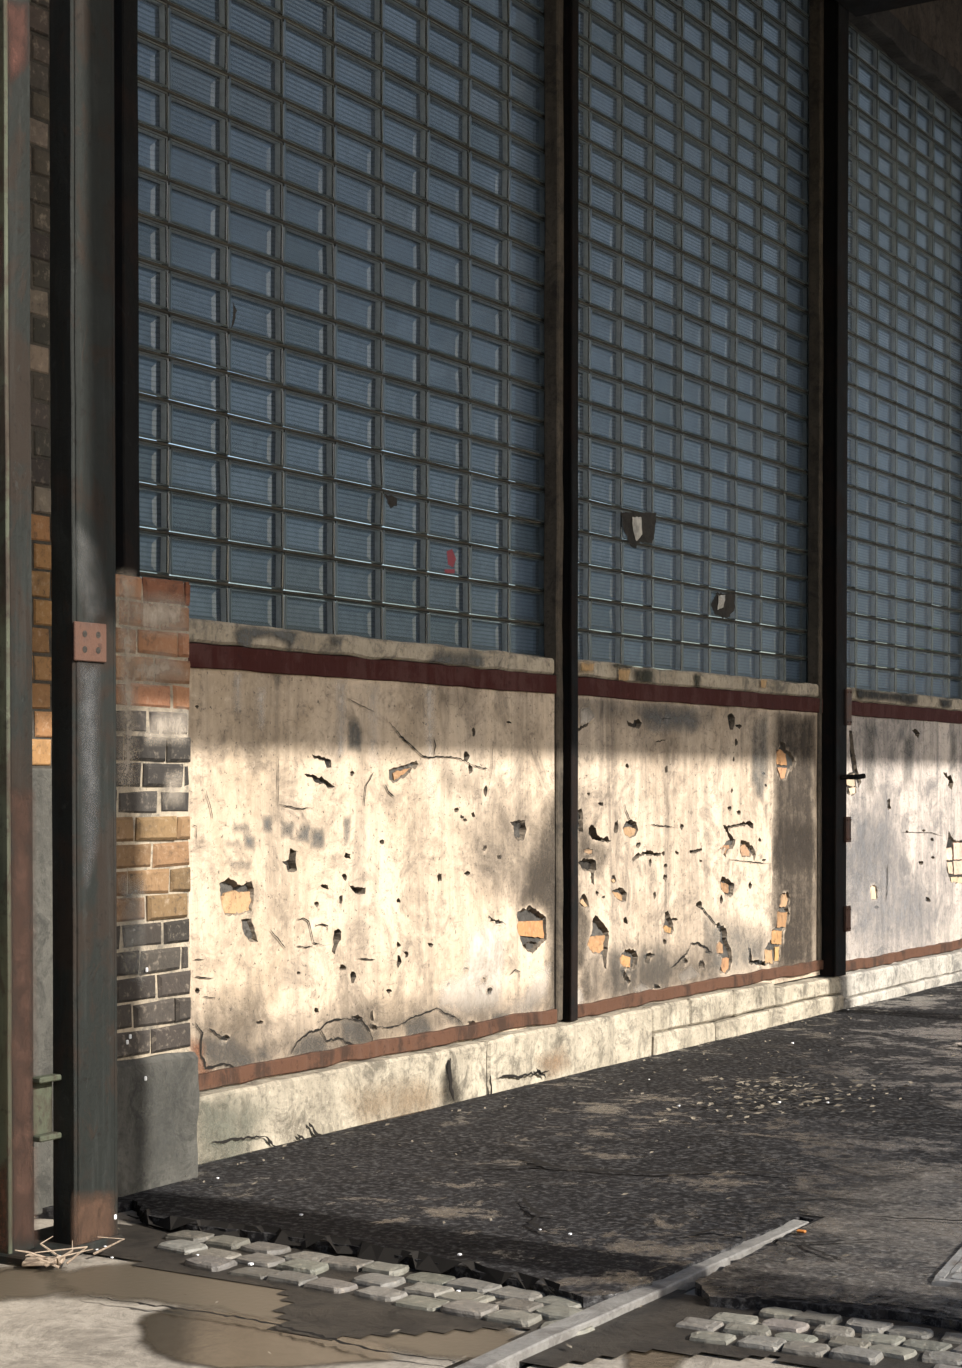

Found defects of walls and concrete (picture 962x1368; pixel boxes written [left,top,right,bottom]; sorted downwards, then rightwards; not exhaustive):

crack [348,698,493,794]
spalling [219,877,258,942]
peeling [443,905,547,1023]
spalling [578,792,702,991]
spalling [680,891,790,980]
spalling [720,876,752,904]
spalling [719,789,766,861]
water stain [753,714,815,966]
spalling [906,829,962,884]